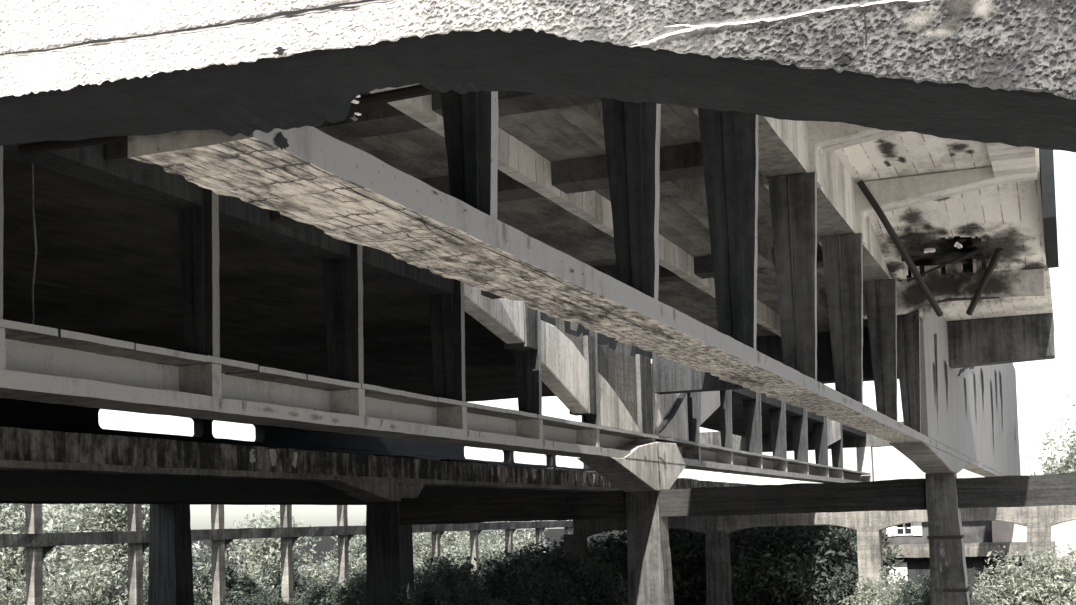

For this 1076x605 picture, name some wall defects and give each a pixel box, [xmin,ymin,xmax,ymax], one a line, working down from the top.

crack [631,0,928,47]
leakage [877,140,906,167]
leakage [950,144,973,156]
leakage [881,212,1047,314]
leakage [964,369,1003,440]